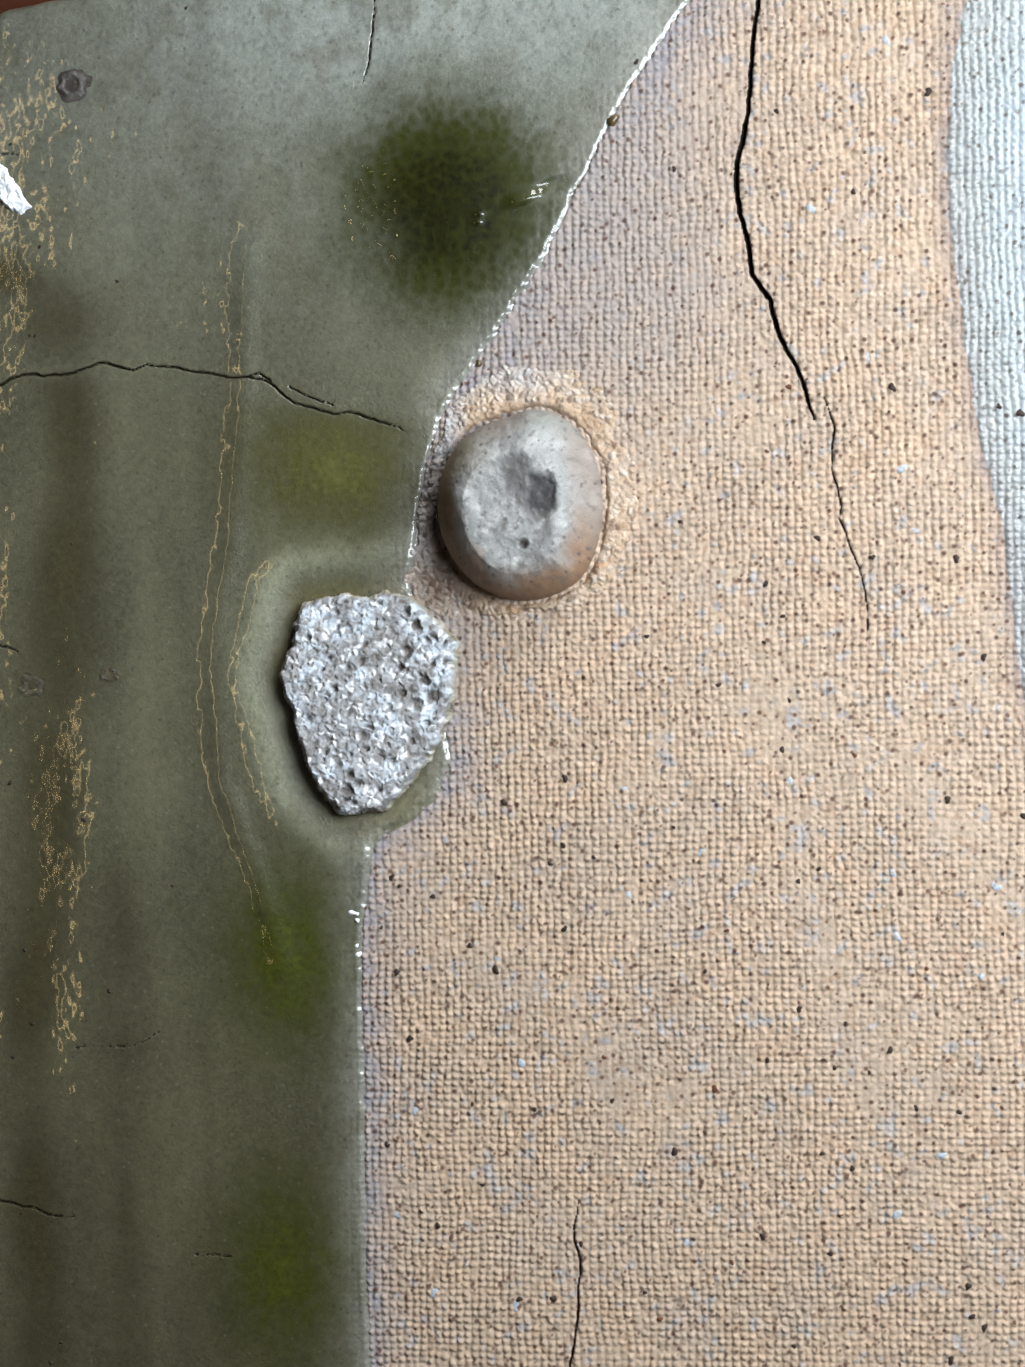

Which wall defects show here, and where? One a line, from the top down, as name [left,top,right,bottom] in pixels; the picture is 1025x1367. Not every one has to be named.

crack [361,0,375,86]
water stain [351,100,551,309]
crack [0,362,400,428]
crack [734,0,869,642]
crack [0,1200,75,1217]
crack [569,1199,581,1367]